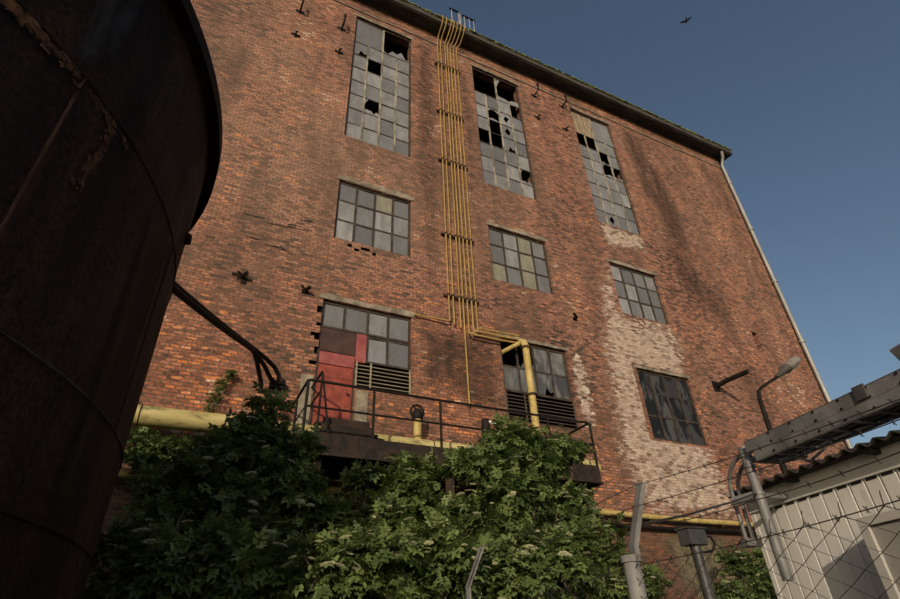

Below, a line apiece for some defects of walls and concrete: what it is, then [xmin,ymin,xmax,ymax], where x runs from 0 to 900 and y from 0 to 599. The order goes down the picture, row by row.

corrosion [0,0,82,86]
flaking render [572,354,596,428]
peeling [595,269,735,520]